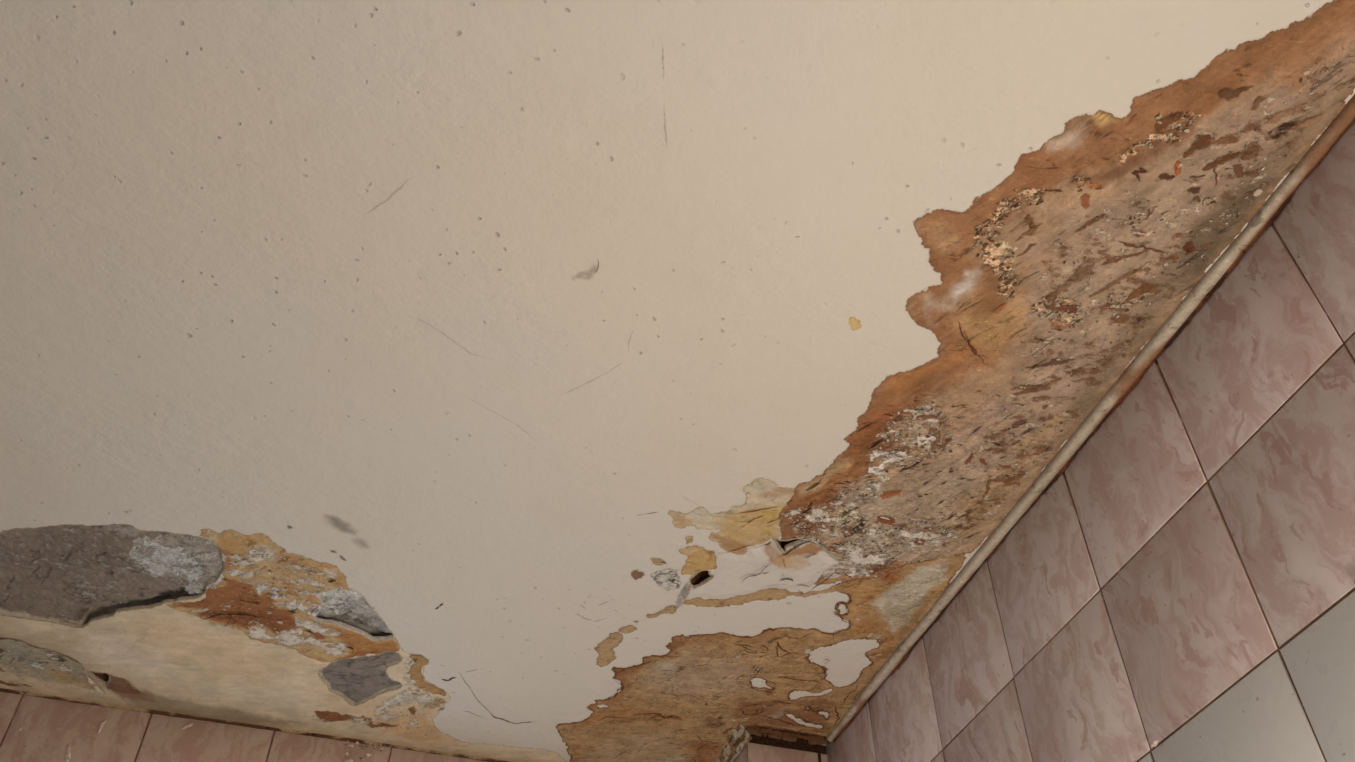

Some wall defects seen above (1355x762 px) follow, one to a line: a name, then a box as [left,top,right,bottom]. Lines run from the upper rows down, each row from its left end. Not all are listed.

flaking render [0,524,225,628]
peeling [651,537,845,608]
peeling [0,639,111,695]
flaking render [313,588,403,706]
flaking render [715,722,829,762]